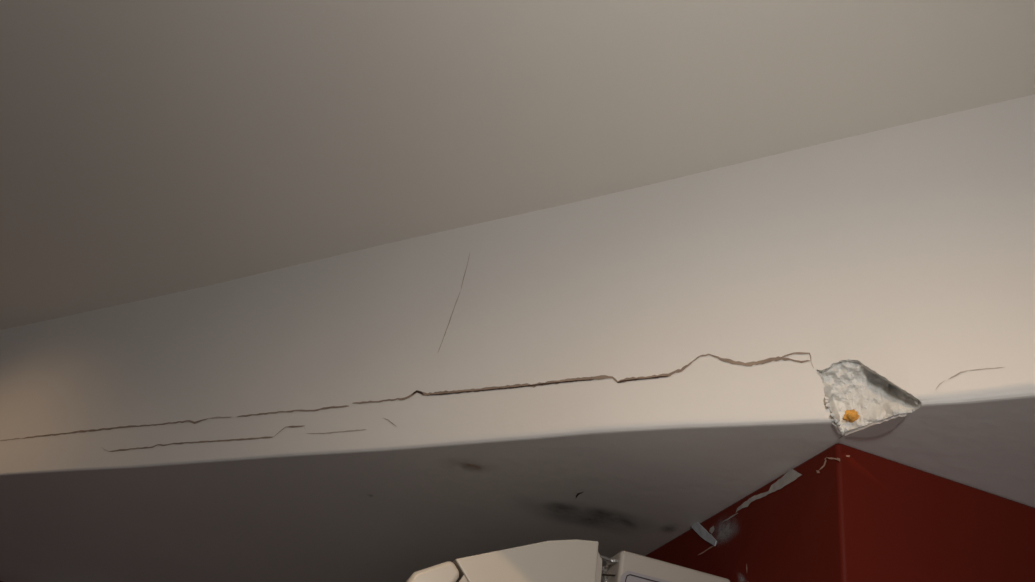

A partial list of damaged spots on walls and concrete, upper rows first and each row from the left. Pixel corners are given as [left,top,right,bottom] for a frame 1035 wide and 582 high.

crack [0,352,814,452]
flaking render [814,359,922,439]